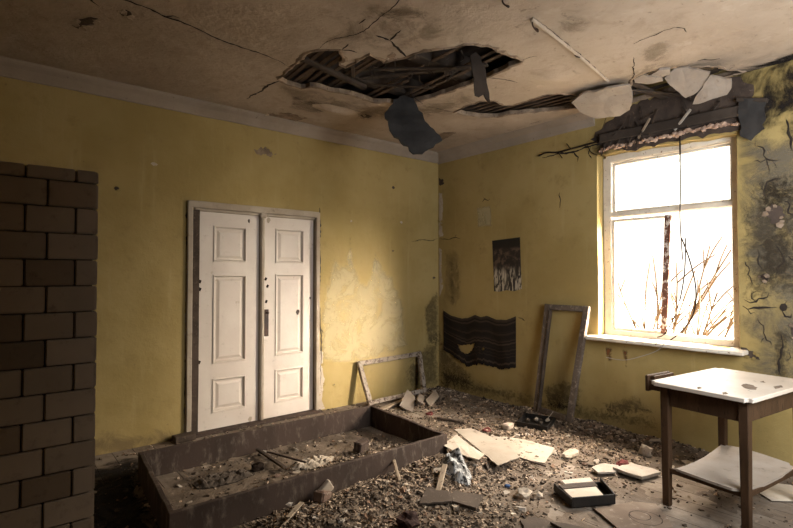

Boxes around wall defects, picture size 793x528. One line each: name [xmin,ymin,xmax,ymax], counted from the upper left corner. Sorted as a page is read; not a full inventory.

crack [125,0,287,99]
crack [320,0,406,57]
crack [632,27,686,78]
spalling [590,77,754,155]
water stain [745,143,793,377]
crack [743,245,793,375]